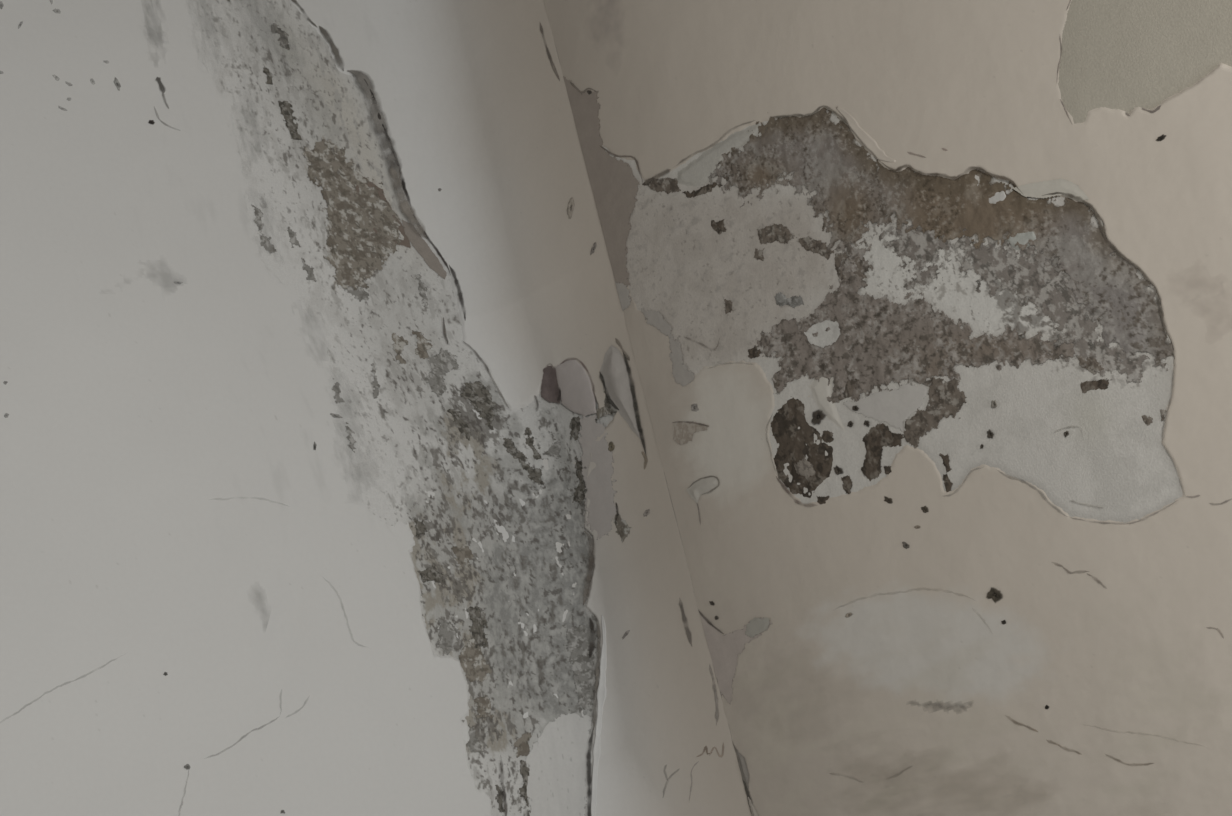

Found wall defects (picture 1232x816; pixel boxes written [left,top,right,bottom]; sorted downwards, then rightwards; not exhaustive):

spalling [188,0,647,816]
spalling [540,23,1183,525]
peeling [1057,0,1232,124]